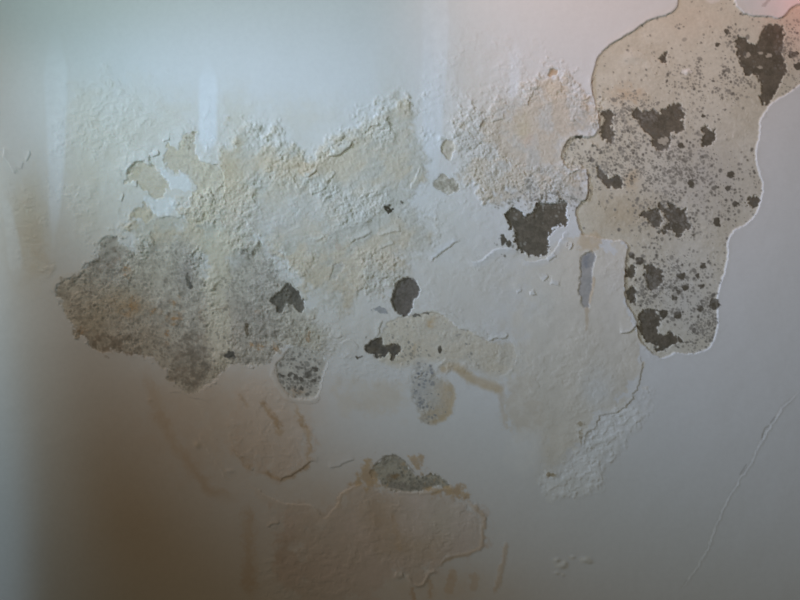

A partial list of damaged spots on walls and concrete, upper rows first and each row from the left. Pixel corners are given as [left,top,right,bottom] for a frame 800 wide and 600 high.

spalling [49,126,524,427]
spalling [493,0,800,359]
damp [216,364,510,600]
spalling [347,450,473,507]